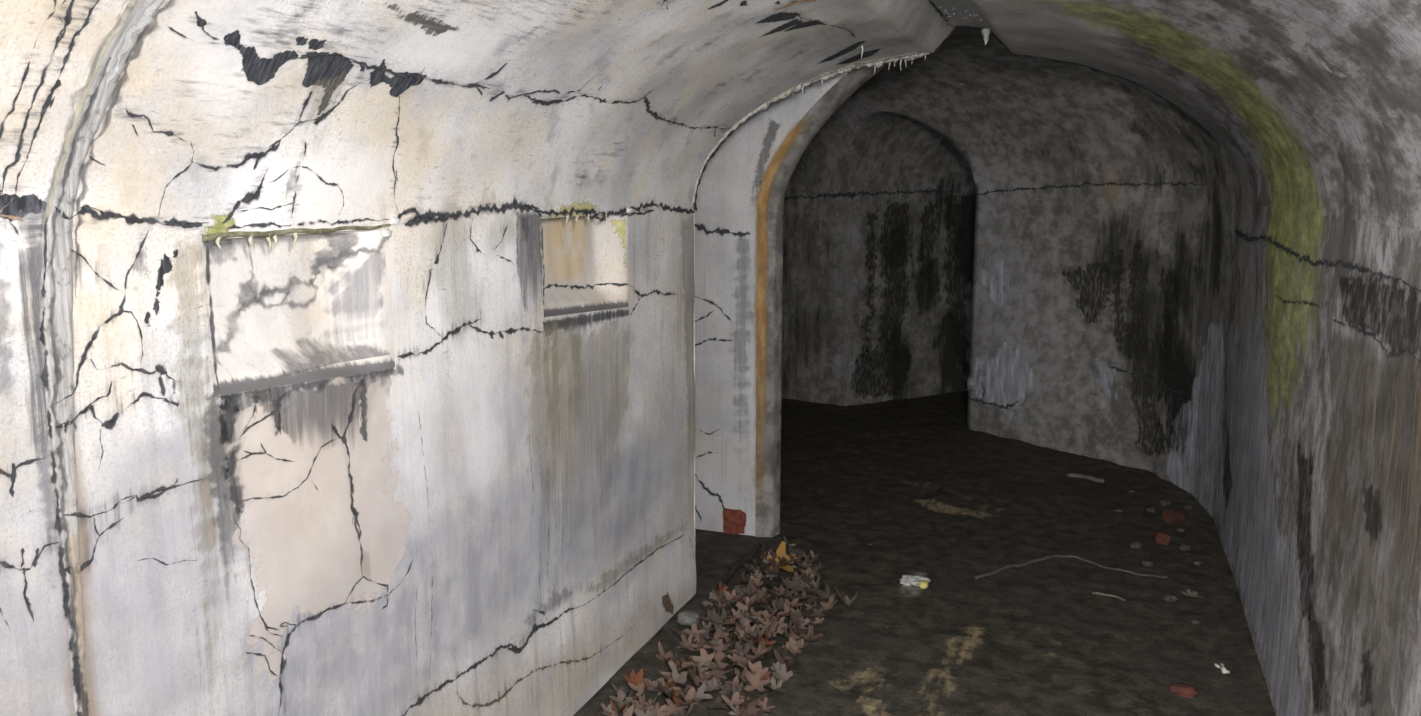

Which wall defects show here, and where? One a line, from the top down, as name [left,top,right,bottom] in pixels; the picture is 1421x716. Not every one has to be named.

crack [0,0,99,236]
crack [169,11,240,48]
crack [0,52,750,497]
corrosion [755,123,804,415]
water stain [847,195,970,399]
water stain [1063,240,1192,457]
crack [1235,229,1421,292]
crack [1275,295,1421,366]
water stain [1339,273,1421,362]
crack [0,479,204,629]
crack [235,380,413,716]
crack [402,429,725,716]